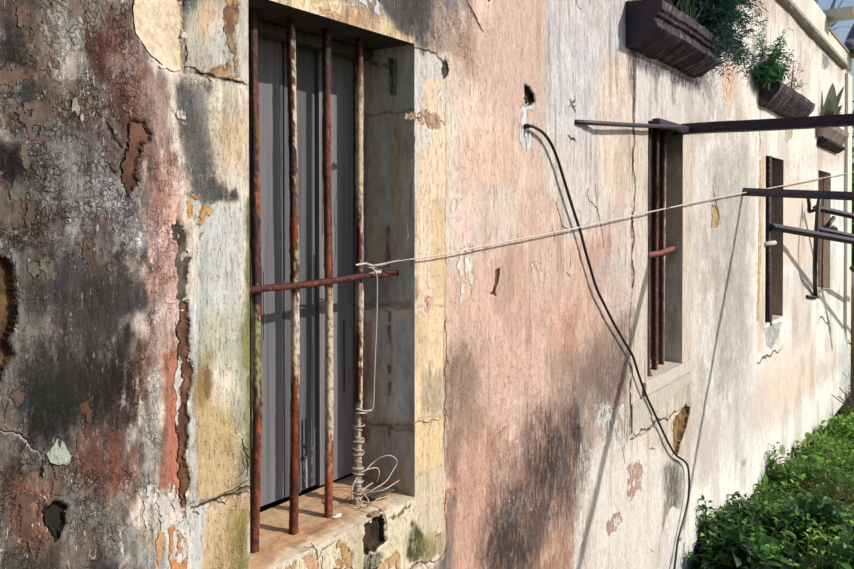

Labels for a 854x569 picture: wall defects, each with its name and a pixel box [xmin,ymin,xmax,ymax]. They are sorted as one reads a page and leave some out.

crack [182,0,248,85]
crack [106,121,123,173]
flaking render [120,119,153,210]
damp [178,84,238,204]
spalling [0,254,24,381]
damp [20,268,139,438]
flaking render [142,192,212,569]
damp [481,322,627,569]
crack [622,56,691,462]
spalling [672,405,690,455]
crack [757,346,783,365]
spalling [334,504,411,569]